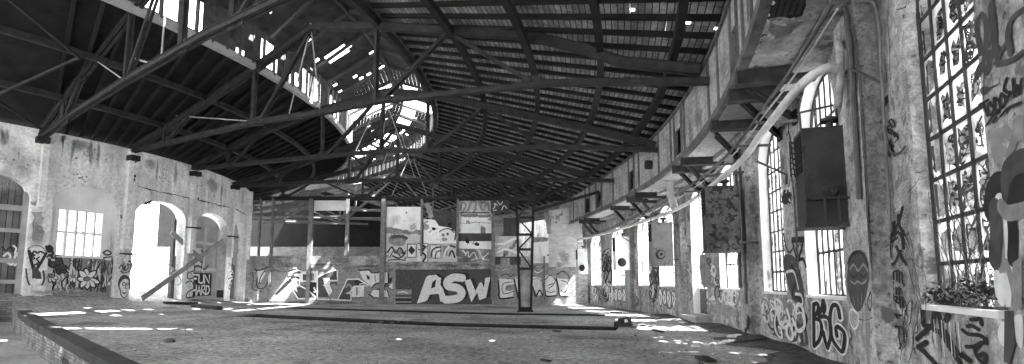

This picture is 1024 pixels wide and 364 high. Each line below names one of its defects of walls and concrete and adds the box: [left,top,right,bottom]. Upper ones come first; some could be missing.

crack [138,186,246,215]